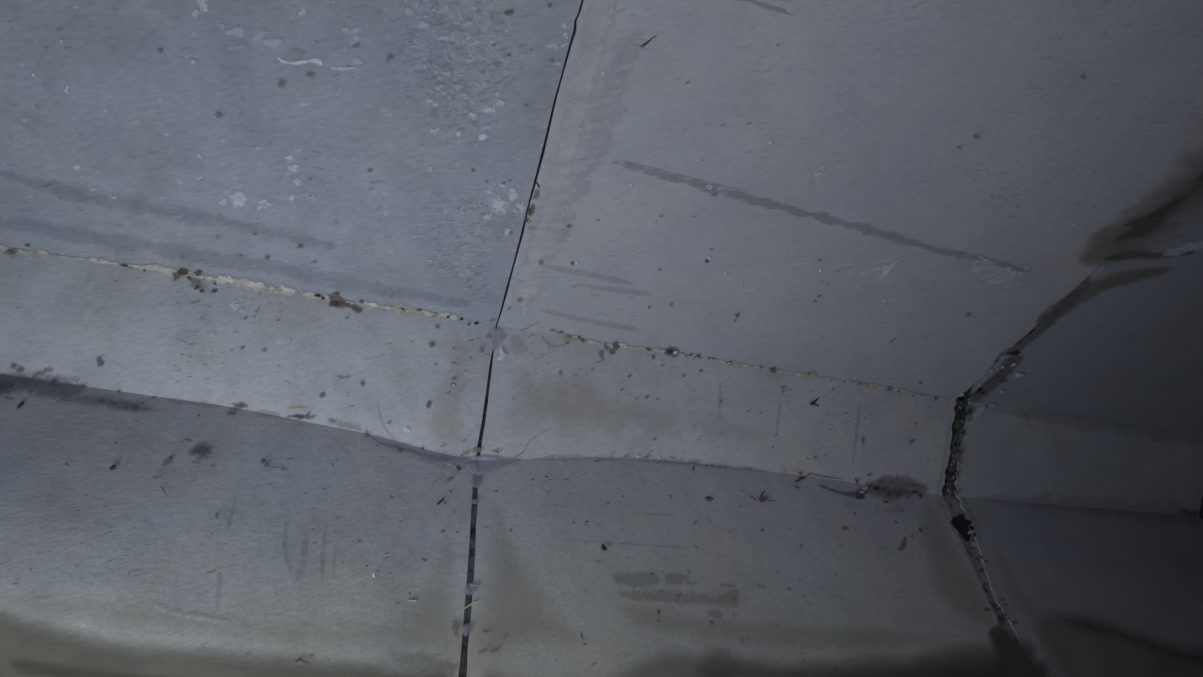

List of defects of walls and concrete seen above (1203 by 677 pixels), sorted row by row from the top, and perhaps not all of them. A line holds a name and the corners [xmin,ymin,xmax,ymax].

spalling [951,514,977,547]